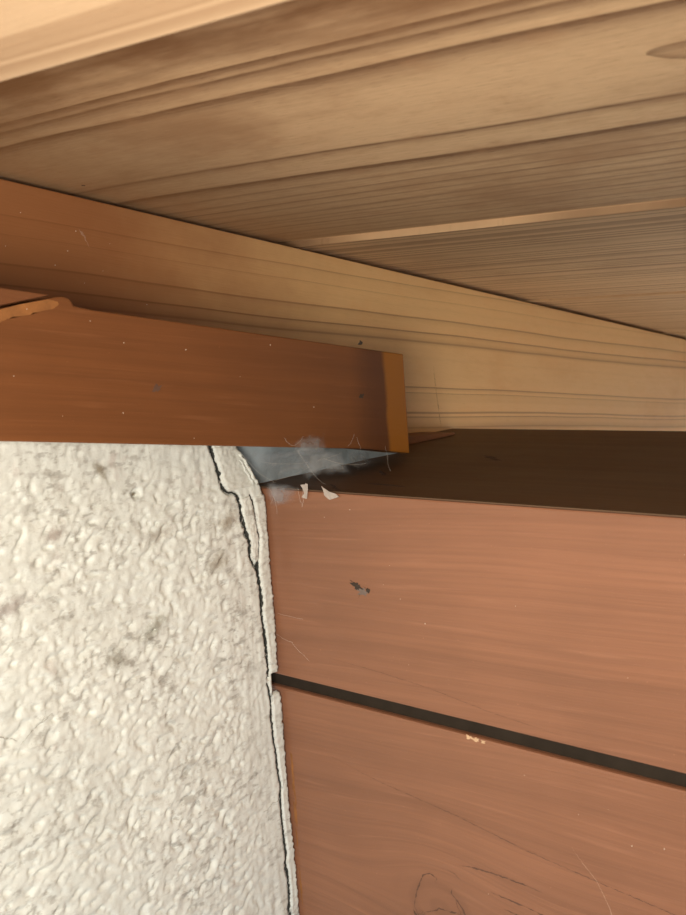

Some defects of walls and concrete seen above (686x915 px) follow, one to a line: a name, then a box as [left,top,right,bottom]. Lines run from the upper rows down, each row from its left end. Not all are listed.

crack [208,446,291,915]